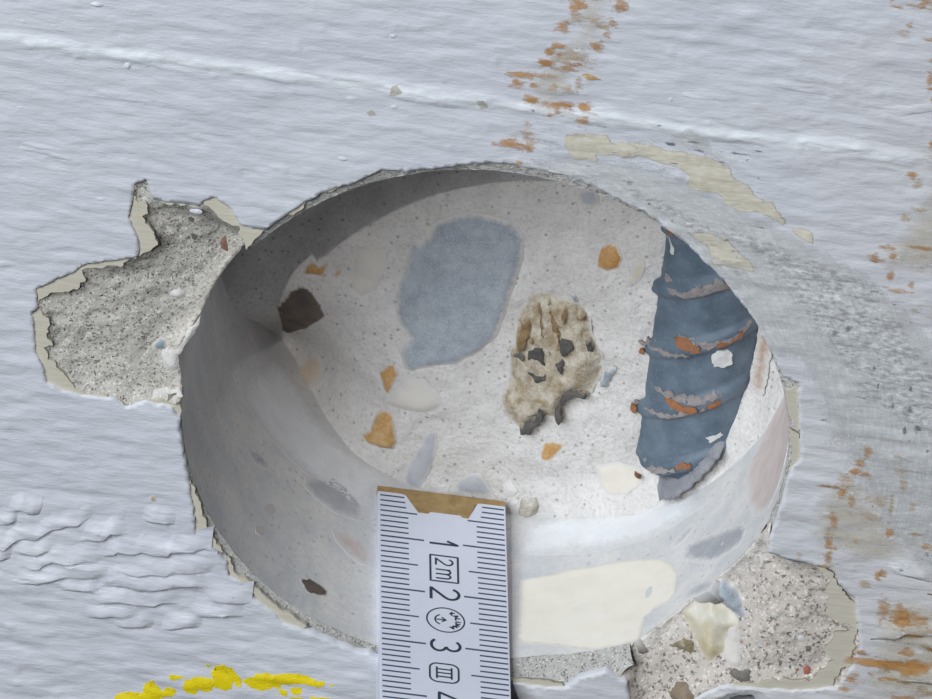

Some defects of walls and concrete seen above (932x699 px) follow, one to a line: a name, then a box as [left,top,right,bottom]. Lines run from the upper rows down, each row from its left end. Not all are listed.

rust [507,44,582,104]
rust [548,103,589,124]
rust [492,131,532,151]
rust [674,336,702,354]
rust [717,330,745,349]
spalling [32,163,687,653]
rust [664,397,721,415]
rust [821,460,893,547]
spalling [510,350,859,699]
rust [880,603,932,638]
rust [846,648,932,693]